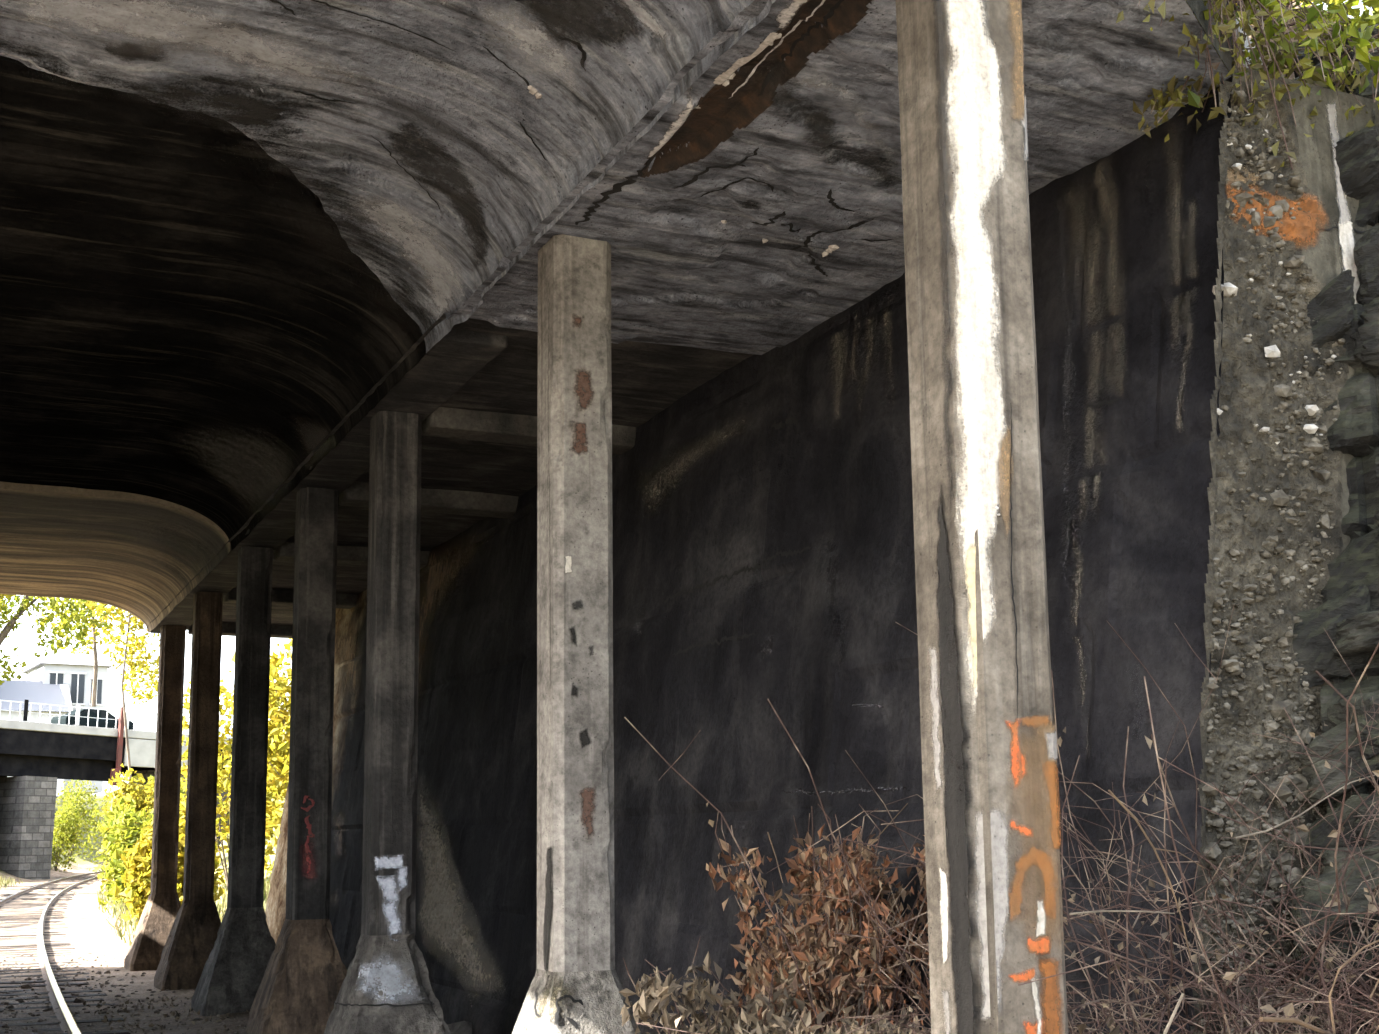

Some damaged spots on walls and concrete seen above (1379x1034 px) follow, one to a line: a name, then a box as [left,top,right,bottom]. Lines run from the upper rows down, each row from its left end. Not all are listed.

spalling [640,0,872,178]
rust [569,370,594,455]
crack [575,158,652,225]
crack [674,148,892,277]
leakage [945,0,1005,711]
leakage [1056,162,1124,750]
leakage [1145,128,1198,429]
rust [1227,170,1326,246]